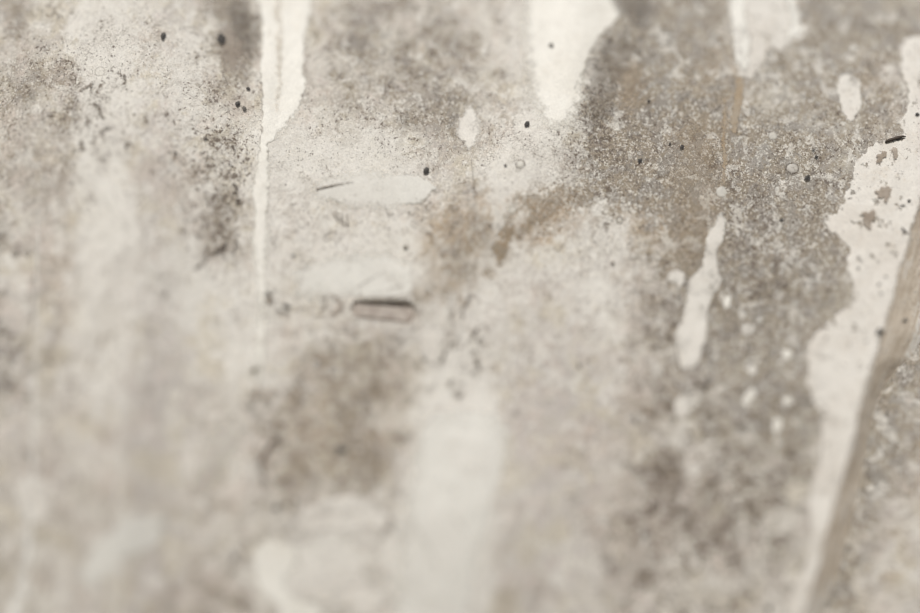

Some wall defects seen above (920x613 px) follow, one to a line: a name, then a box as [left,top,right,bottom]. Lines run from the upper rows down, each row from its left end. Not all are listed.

peeling [727,0,810,79]
peeling [741,323,755,336]
peeling [785,35,920,613]
peeling [741,388,756,407]
peeling [772,417,782,434]
peeling [253,494,389,613]